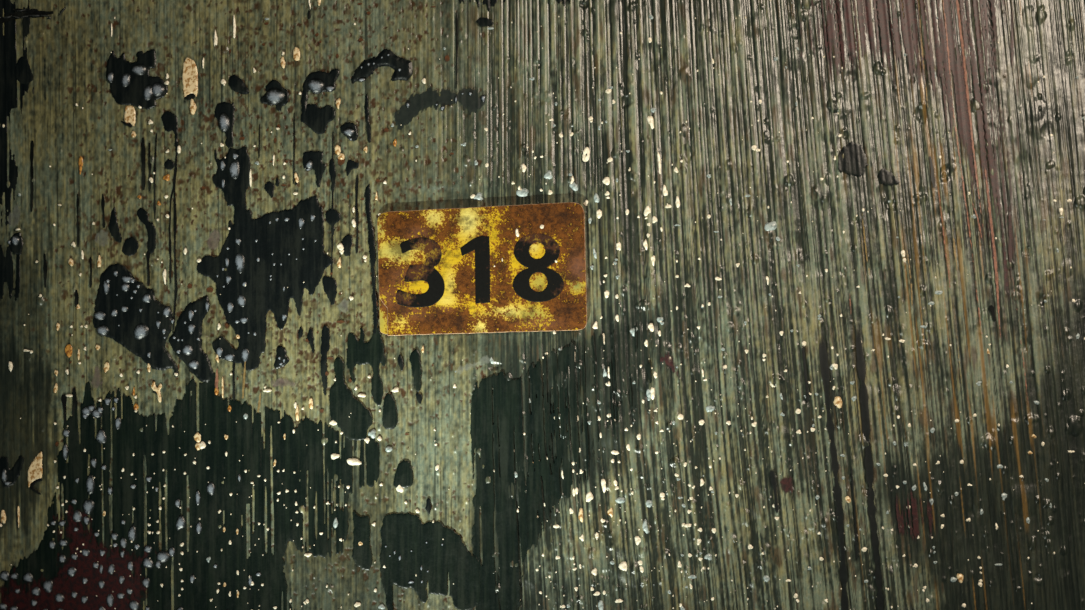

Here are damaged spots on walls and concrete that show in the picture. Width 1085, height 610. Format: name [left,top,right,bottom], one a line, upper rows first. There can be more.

peeling [459,0,506,27]
peeling [0,47,661,610]